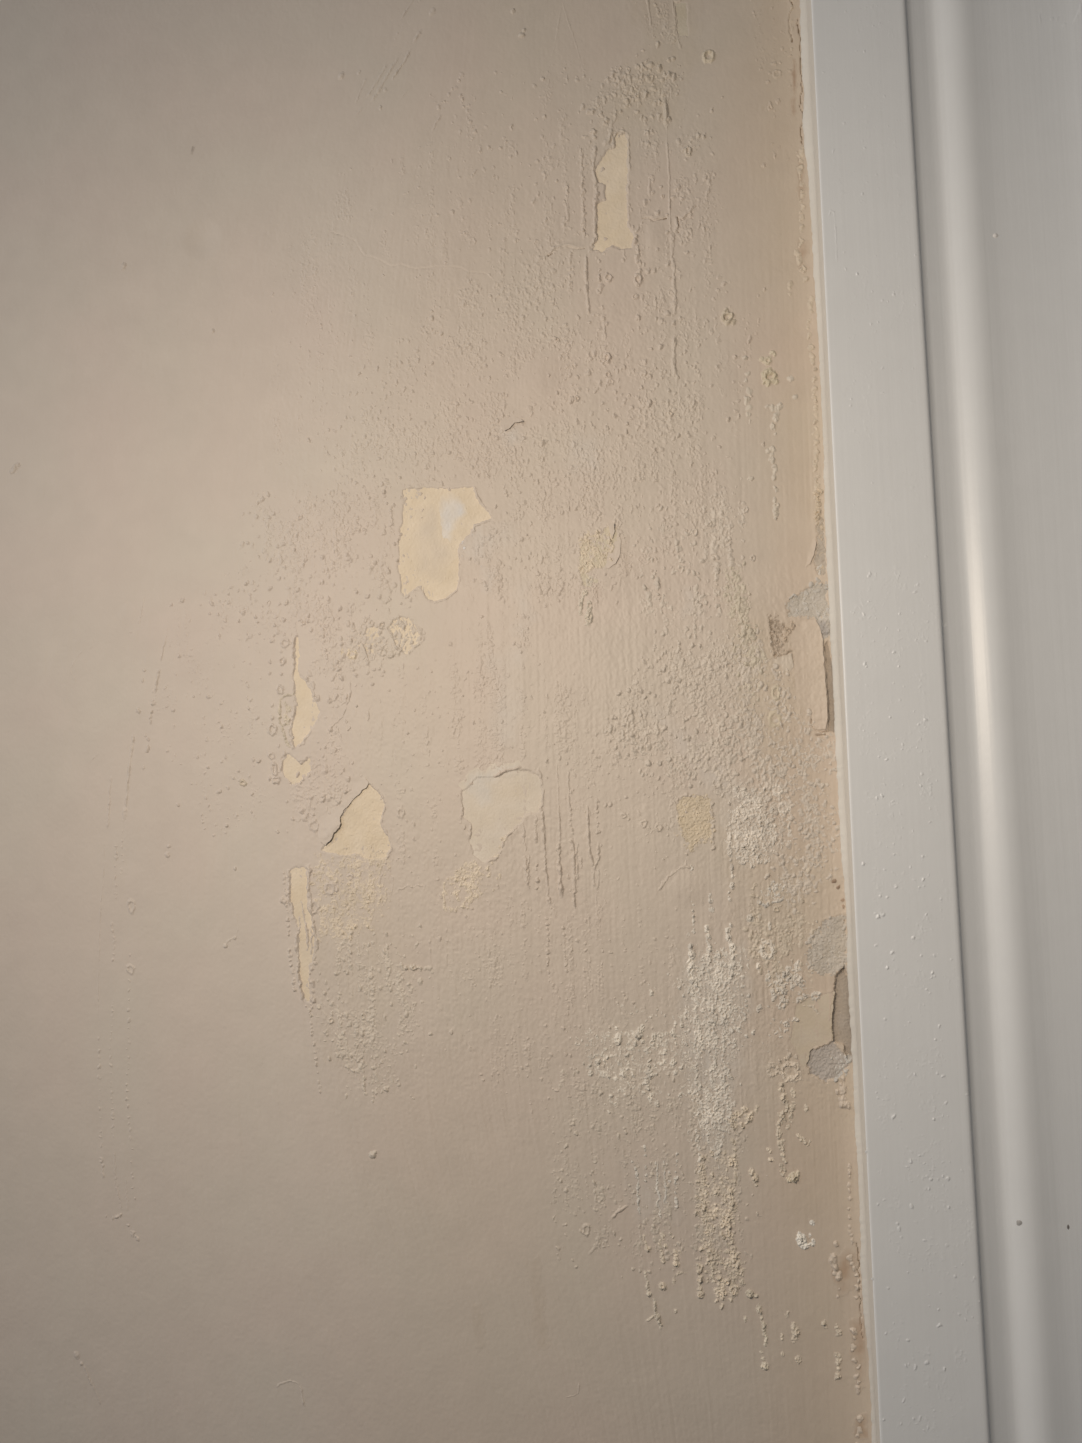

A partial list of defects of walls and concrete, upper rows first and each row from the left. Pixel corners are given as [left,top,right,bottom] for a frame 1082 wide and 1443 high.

peeling [579,111,643,295]
peeling [341,486,494,666]
peeling [767,487,830,729]
peeling [277,636,320,788]
peeling [280,776,424,1094]
spalling [804,879,852,1083]